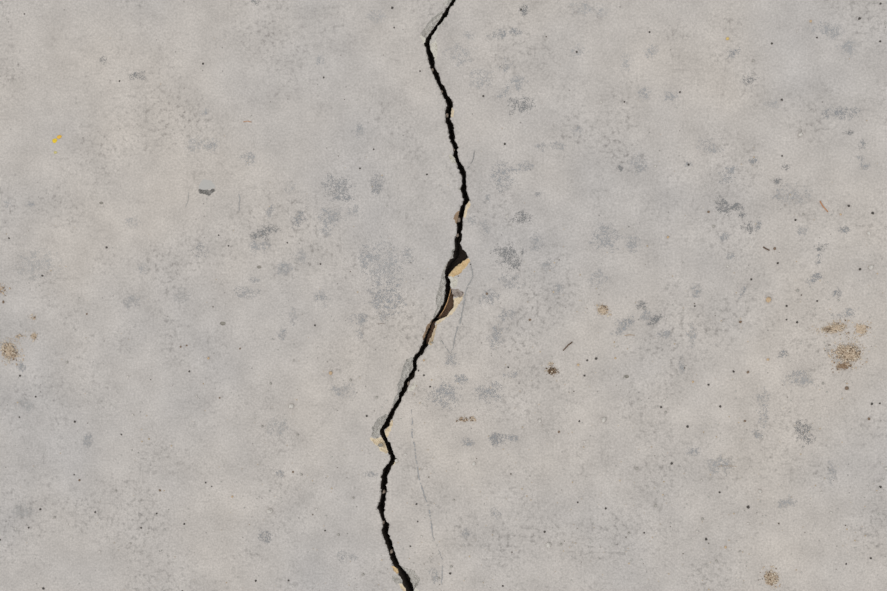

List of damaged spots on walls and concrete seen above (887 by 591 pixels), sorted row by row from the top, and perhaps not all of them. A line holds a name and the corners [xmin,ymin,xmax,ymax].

crack [377,0,475,591]